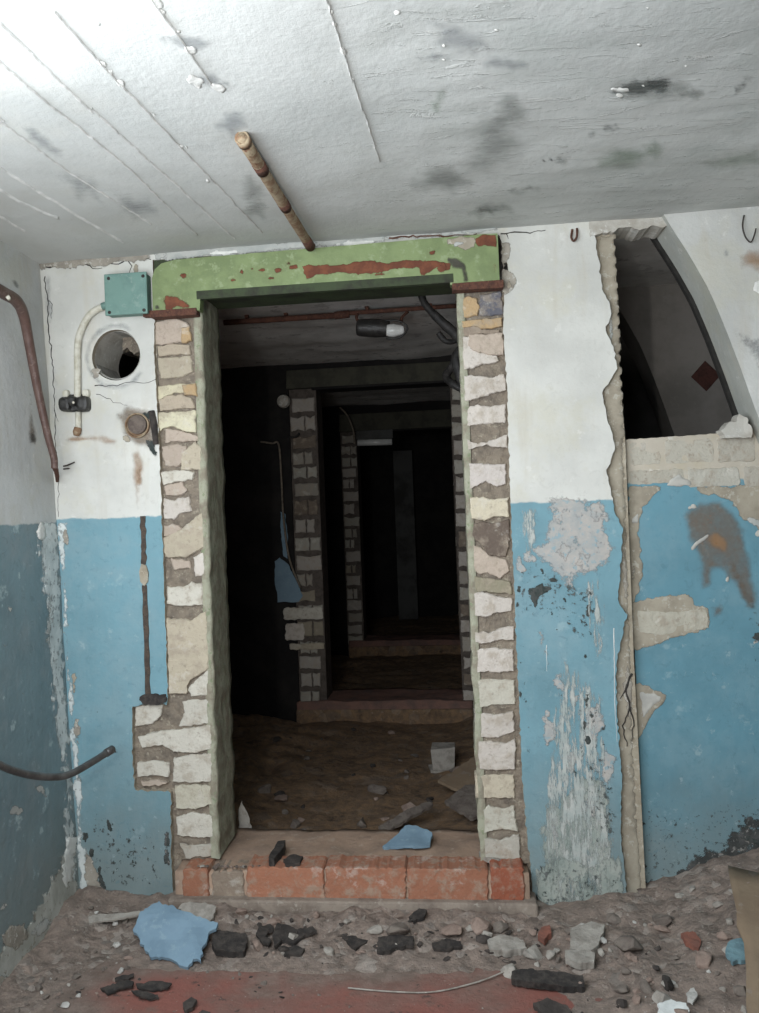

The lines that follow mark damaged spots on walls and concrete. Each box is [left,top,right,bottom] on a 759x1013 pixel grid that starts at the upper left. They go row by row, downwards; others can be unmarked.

damp [624,81,667,94]
corrosion [231,251,467,281]
flaking render [501,242,516,295]
peeling [516,234,759,905]
corrosion [688,504,753,603]
crack [620,673,634,744]
flaking render [0,522,170,986]